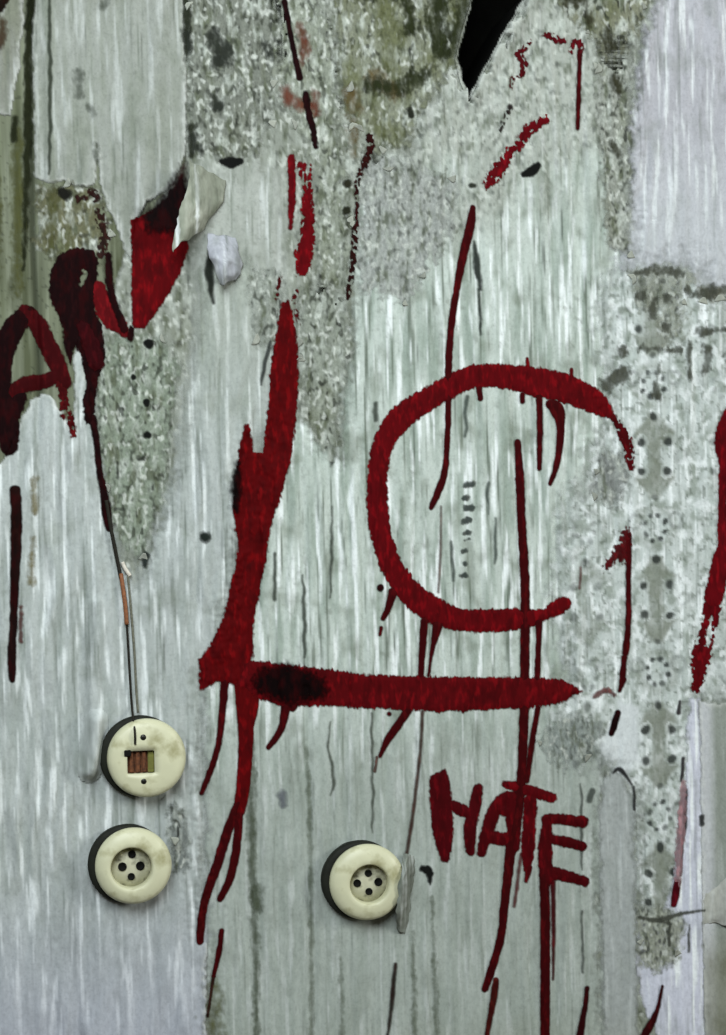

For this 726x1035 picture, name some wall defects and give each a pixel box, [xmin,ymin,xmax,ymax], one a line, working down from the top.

peeling [182,0,469,465]
peeling [590,454,629,505]
peeling [537,713,603,769]
peeling [634,906,685,973]